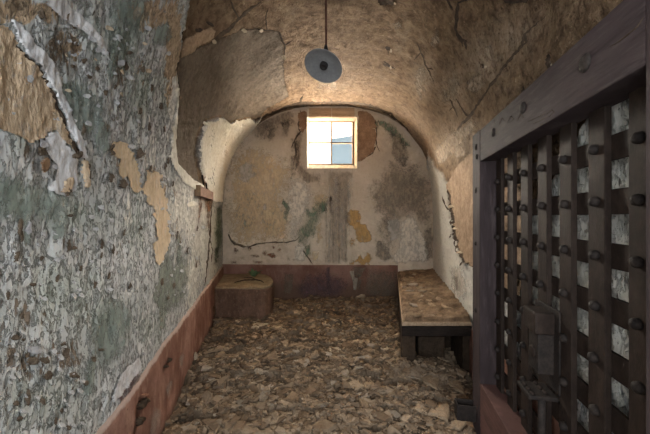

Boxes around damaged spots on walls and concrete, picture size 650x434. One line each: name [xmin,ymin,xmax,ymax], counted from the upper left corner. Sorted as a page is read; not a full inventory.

spalling [0,19,92,197]
peeling [37,0,135,98]
spalling [108,21,289,265]
spalling [357,110,377,162]
crack [446,0,467,50]
crack [436,16,545,160]
peeling [17,219,32,242]
peeling [79,238,115,271]
crack [228,234,312,263]
water stain [347,131,429,296]
crack [442,186,472,267]